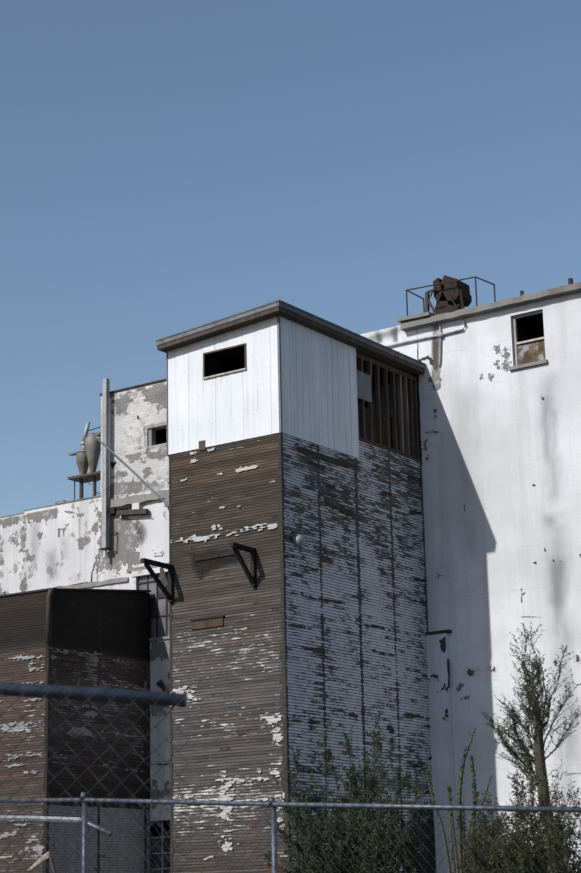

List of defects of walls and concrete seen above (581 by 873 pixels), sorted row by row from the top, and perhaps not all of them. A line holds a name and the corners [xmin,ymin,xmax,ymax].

peeling [479,344,511,382]
peeling [110,381,166,415]
flaking render [109,448,167,500]
flaking render [0,507,158,591]
peeling [289,592,347,604]
peeling [428,669,475,700]